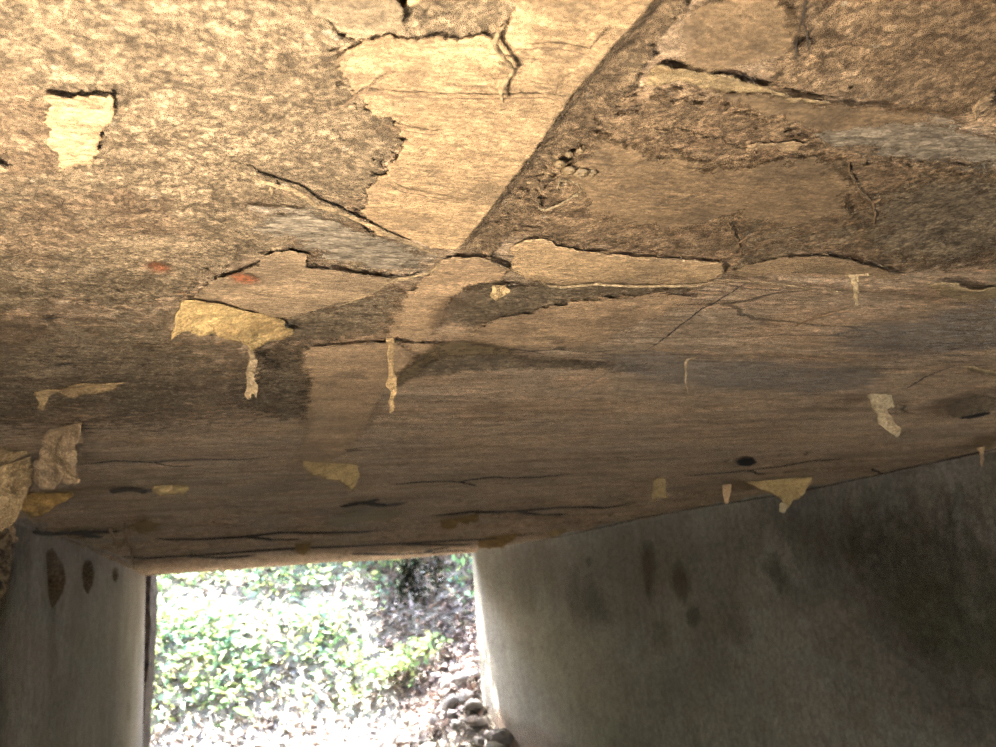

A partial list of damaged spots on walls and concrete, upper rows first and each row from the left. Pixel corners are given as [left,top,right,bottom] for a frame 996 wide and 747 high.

spalling [0,0,996,492]
crack [516,282,747,355]
peeling [152,485,189,496]
peeling [721,484,732,504]
peeling [746,477,812,513]
peeling [0,420,91,608]
peeling [294,543,311,556]
peeling [477,533,521,549]
spalling [82,560,94,594]